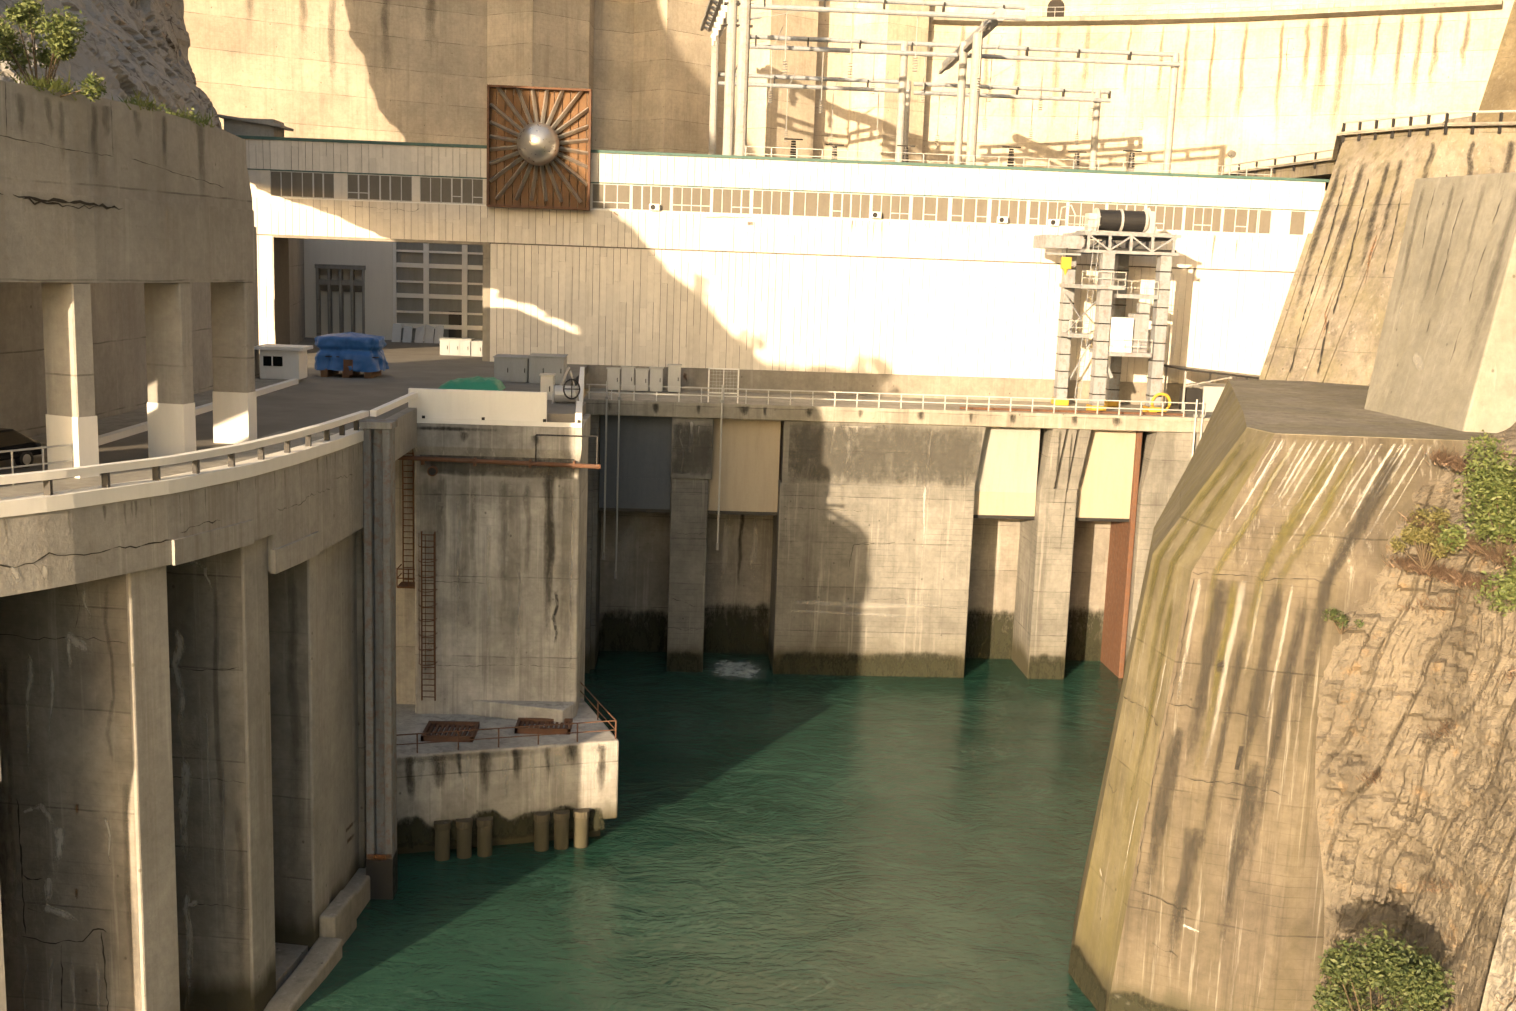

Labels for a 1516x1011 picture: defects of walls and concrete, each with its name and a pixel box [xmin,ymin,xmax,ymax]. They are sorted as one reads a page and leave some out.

crack [0,84,223,188]
crack [0,193,120,210]
damp [420,427,467,438]
crack [0,520,220,643]
damp [420,436,574,638]
damp [1127,441,1404,903]
damp [1173,832,1200,930]